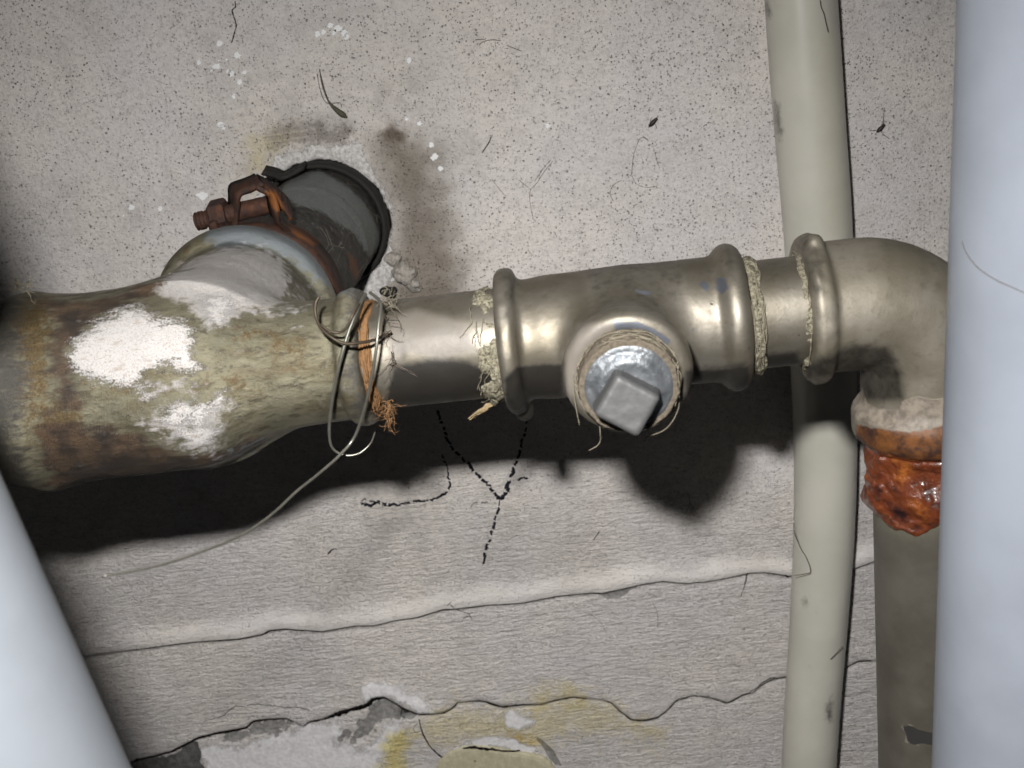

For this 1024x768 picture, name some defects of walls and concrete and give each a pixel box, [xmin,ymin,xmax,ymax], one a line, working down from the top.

crack [137,572,789,650]
flaking render [130,741,204,768]
flaking render [222,719,299,742]
flaking render [338,698,417,744]
crack [129,677,785,763]
flaking render [537,738,561,766]